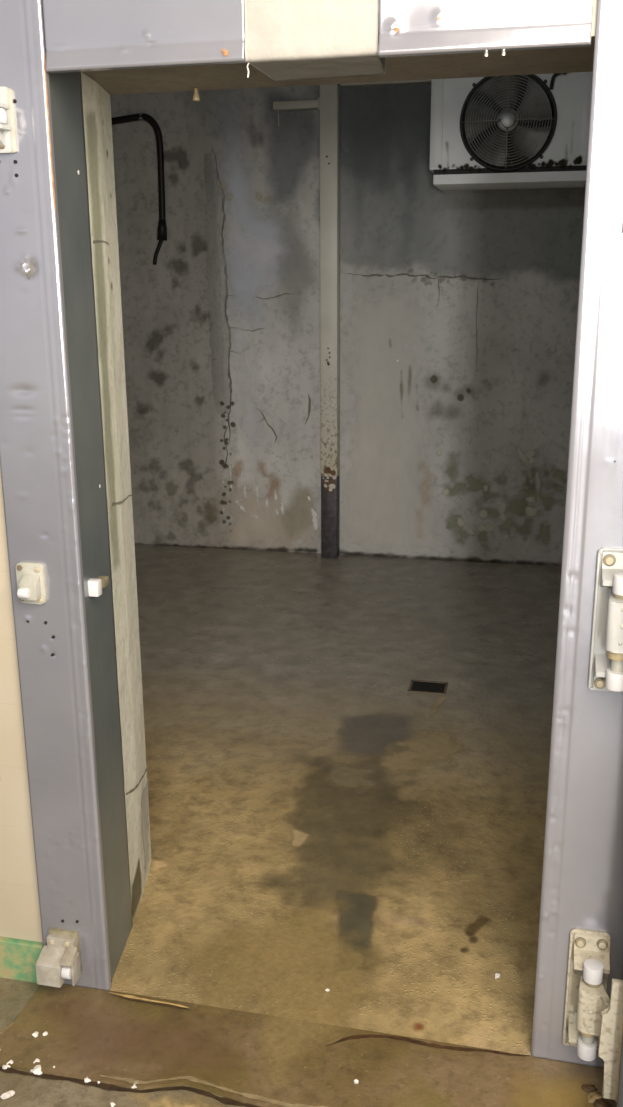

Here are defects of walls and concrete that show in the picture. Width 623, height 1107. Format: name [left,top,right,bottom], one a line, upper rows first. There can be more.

crack [212,149,290,471]
rust [323,467,337,492]
crack [348,273,506,362]
leakage [340,299,567,565]
leakage [297,715,406,971]